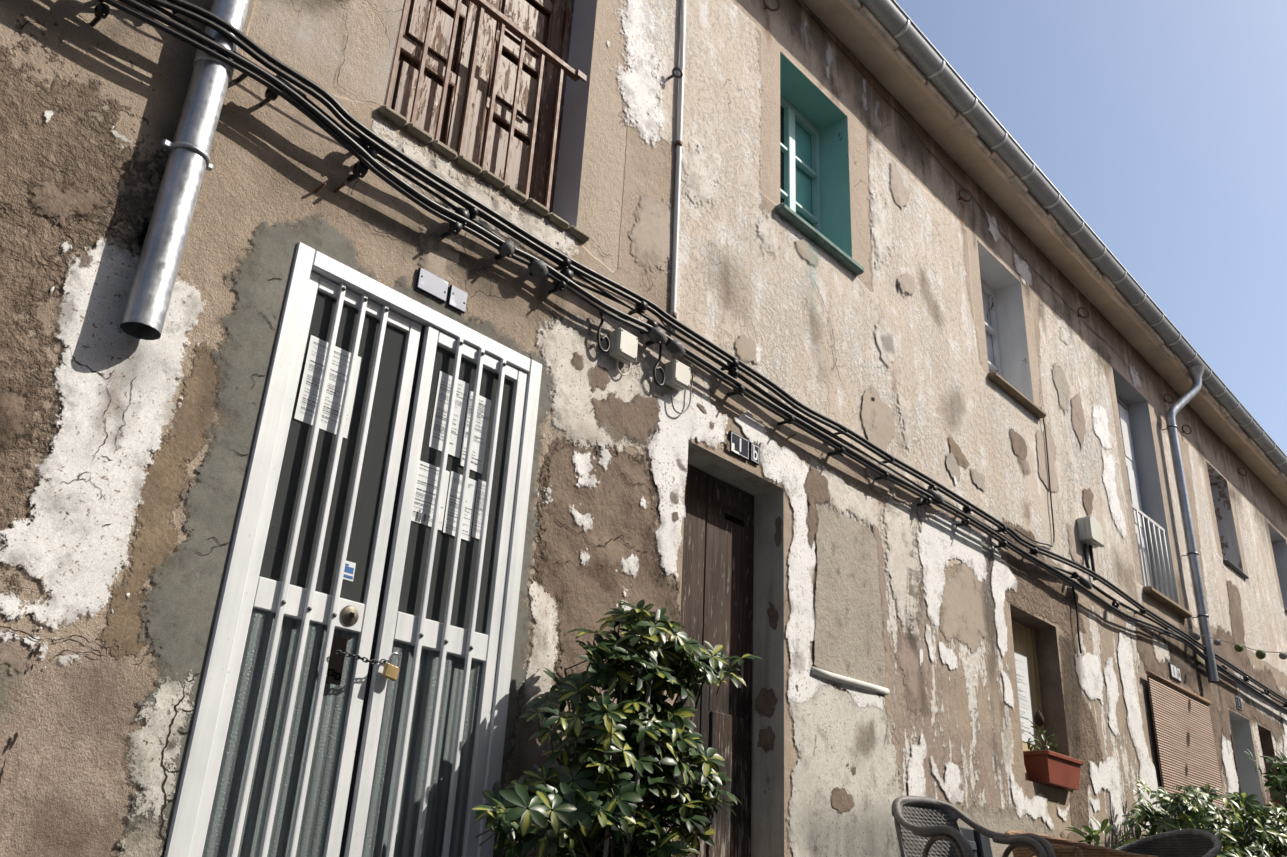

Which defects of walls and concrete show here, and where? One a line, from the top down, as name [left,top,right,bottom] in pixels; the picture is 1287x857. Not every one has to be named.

crack [337,6,381,106]
peeling [607,0,677,148]
peeling [986,212,1033,287]
crack [61,352,138,526]
peeling [0,220,221,674]
spalling [1010,425,1031,475]
spalling [523,308,885,753]
peeling [861,385,1017,804]
crack [0,732,18,783]
spalling [831,787,855,813]